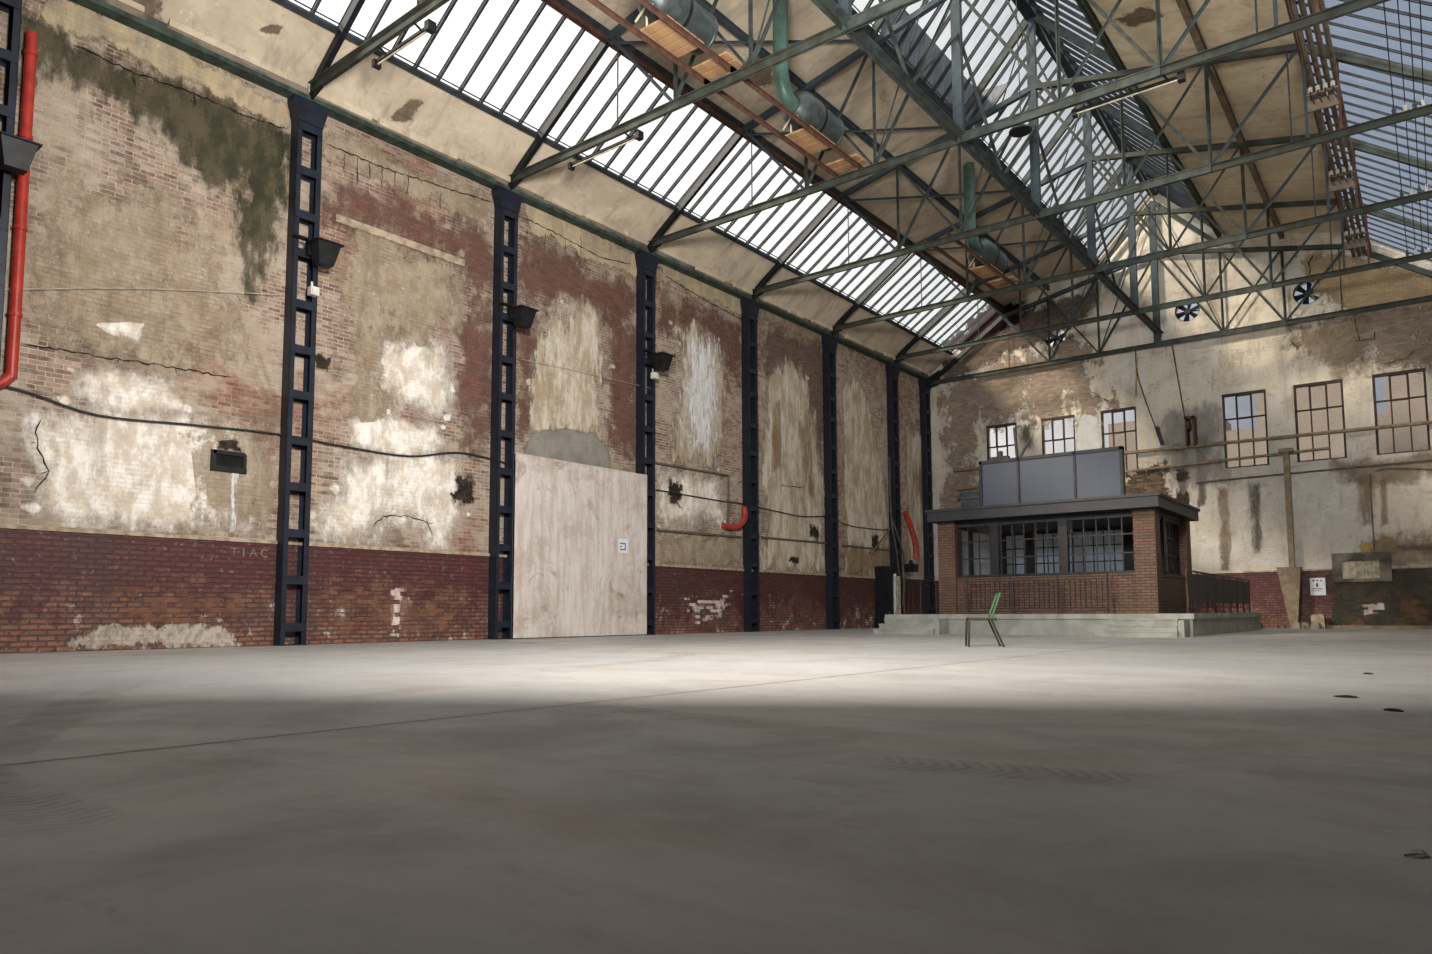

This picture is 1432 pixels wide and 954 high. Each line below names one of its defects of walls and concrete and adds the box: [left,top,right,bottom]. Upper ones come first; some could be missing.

water stain [17,14,291,303]
peeling [8,161,279,539]
peeling [310,134,495,551]
peeling [515,203,637,460]
peeling [655,264,924,580]
flaking render [937,287,1120,509]
water stain [1331,448,1432,484]
spalling [56,621,235,651]
spalling [684,590,732,624]
spalling [1359,598,1430,626]